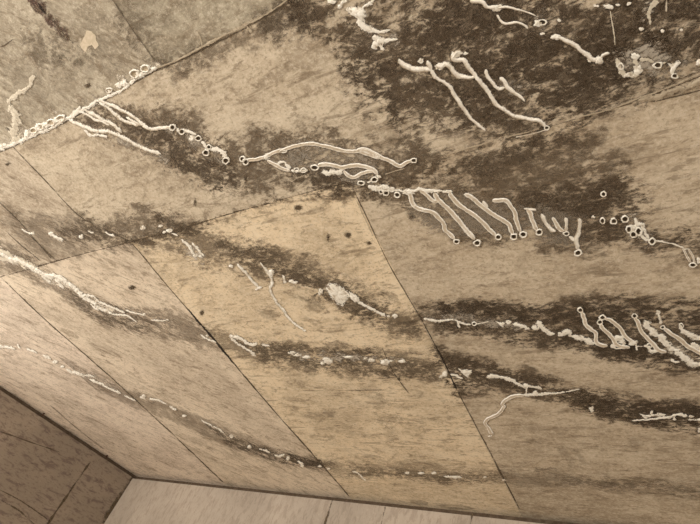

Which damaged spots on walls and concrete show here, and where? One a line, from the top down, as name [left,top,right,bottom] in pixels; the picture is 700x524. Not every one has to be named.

water stain [0,0,700,268]
water stain [0,246,168,322]
water stain [58,203,700,377]
water stain [0,344,187,417]
water stain [431,344,700,437]